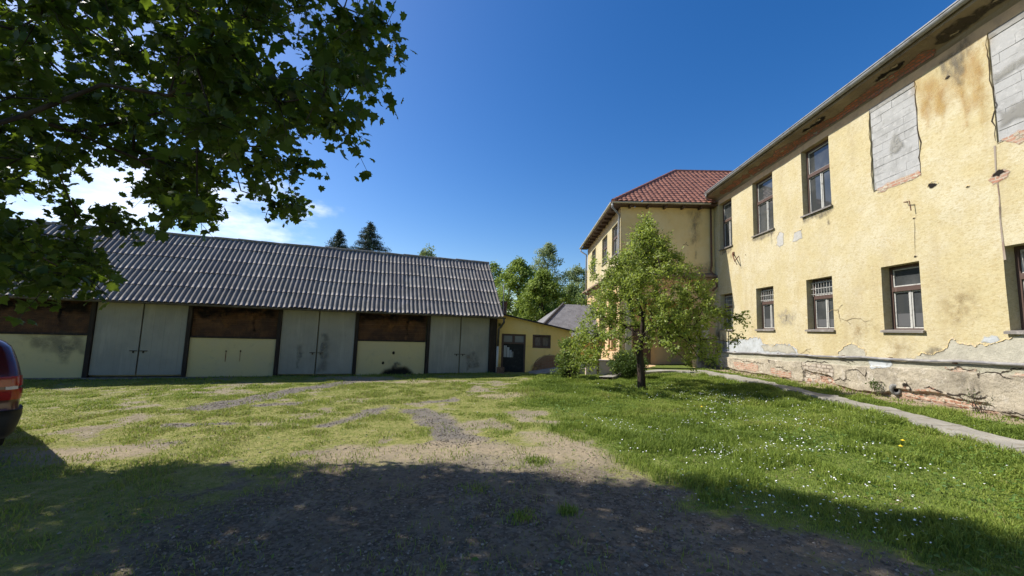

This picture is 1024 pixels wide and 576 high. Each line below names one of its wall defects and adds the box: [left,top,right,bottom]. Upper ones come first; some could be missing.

flaking render [720,0,1005,194]
flaking render [989,169,1010,185]
peeling [717,336,892,378]
peeling [906,334,1024,377]
spalling [900,380,976,411]
crack [926,366,1024,416]